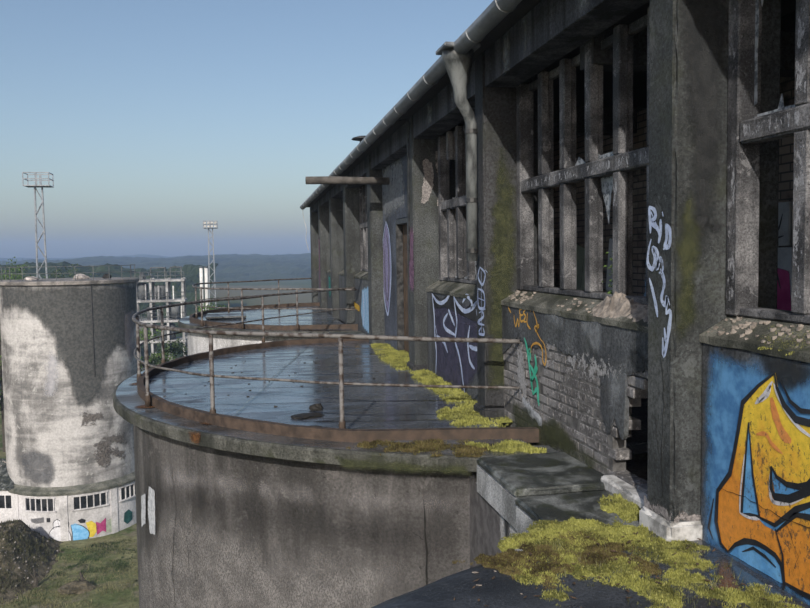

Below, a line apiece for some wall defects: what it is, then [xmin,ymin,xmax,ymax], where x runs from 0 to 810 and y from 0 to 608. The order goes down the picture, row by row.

water stain [2,285,136,406]
peeling [515,345,542,426]
peeling [563,351,622,381]
water stain [22,453,53,483]
crack [421,497,429,585]